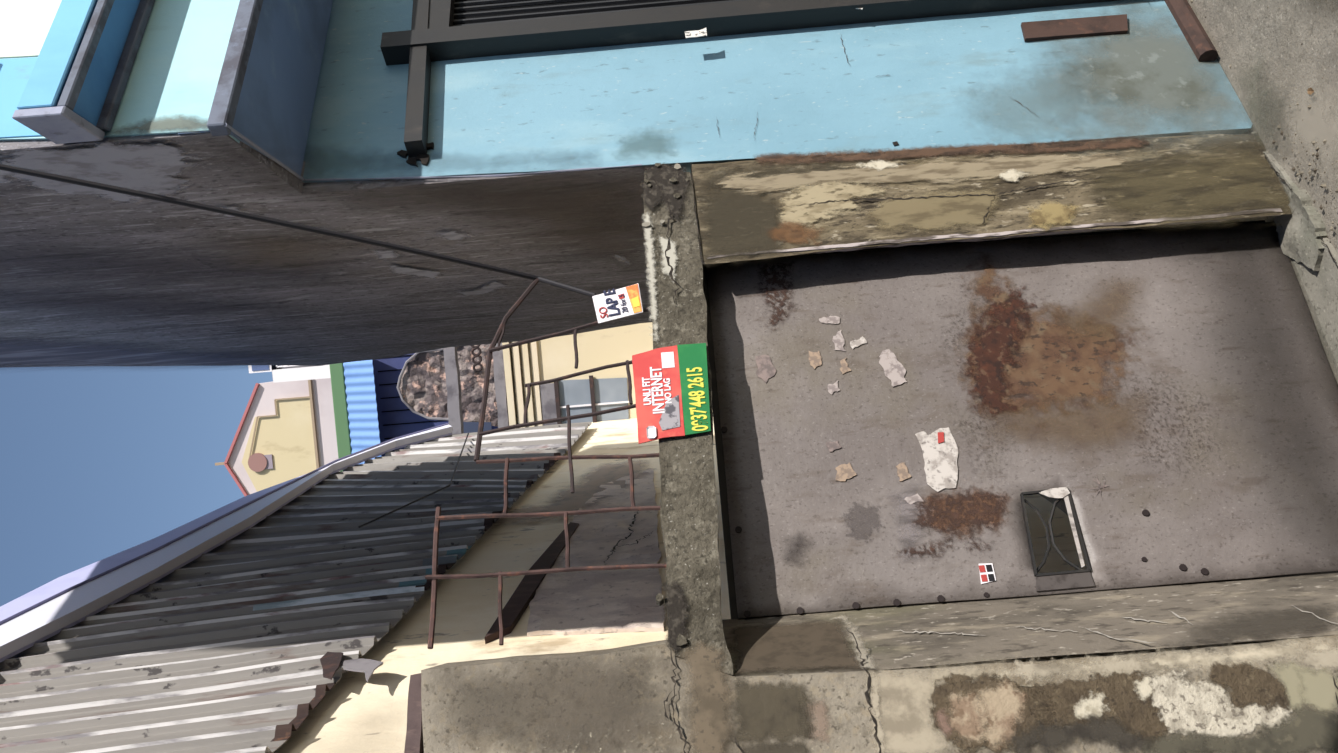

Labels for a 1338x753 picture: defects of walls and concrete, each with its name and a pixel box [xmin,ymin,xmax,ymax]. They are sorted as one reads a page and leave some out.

flaking render [717,137,1149,230]
crack [1248,129,1292,191]
rust [759,262,794,329]
rust [961,255,1131,441]
crack [664,644,687,753]
crack [846,628,885,753]
spalling [877,648,1338,753]